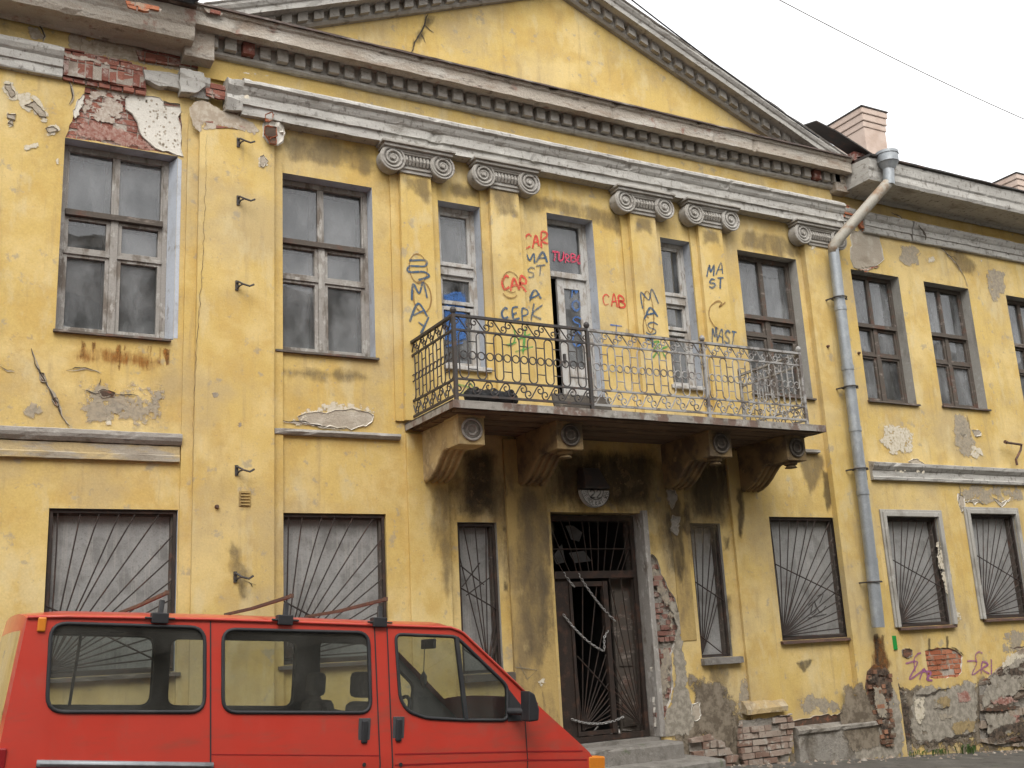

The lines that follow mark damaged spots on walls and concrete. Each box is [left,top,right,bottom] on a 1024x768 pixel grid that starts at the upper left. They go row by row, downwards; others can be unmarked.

crack [411,14,434,52]
flaking render [2,33,259,155]
spalling [843,205,884,273]
corrosion [81,342,149,368]
crack [0,348,134,427]
peeling [78,381,165,426]
water stain [465,454,492,513]
water stain [559,452,649,503]
peeling [880,424,925,474]
flaking render [651,555,677,722]
flaking render [902,647,961,679]
flaking render [865,665,971,747]